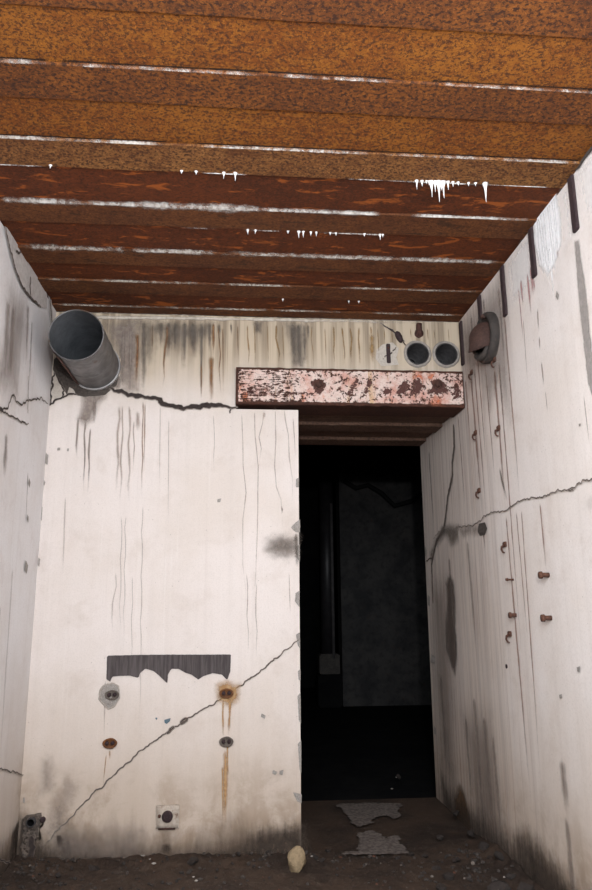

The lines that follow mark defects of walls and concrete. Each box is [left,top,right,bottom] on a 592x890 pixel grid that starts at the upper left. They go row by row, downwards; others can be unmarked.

water stain [64,304,370,387]
corrosion [518,270,535,356]
crack [109,387,238,413]
crack [426,424,592,598]
peeling [98,654,231,709]
crack [47,639,300,842]
corrosion [218,683,237,726]